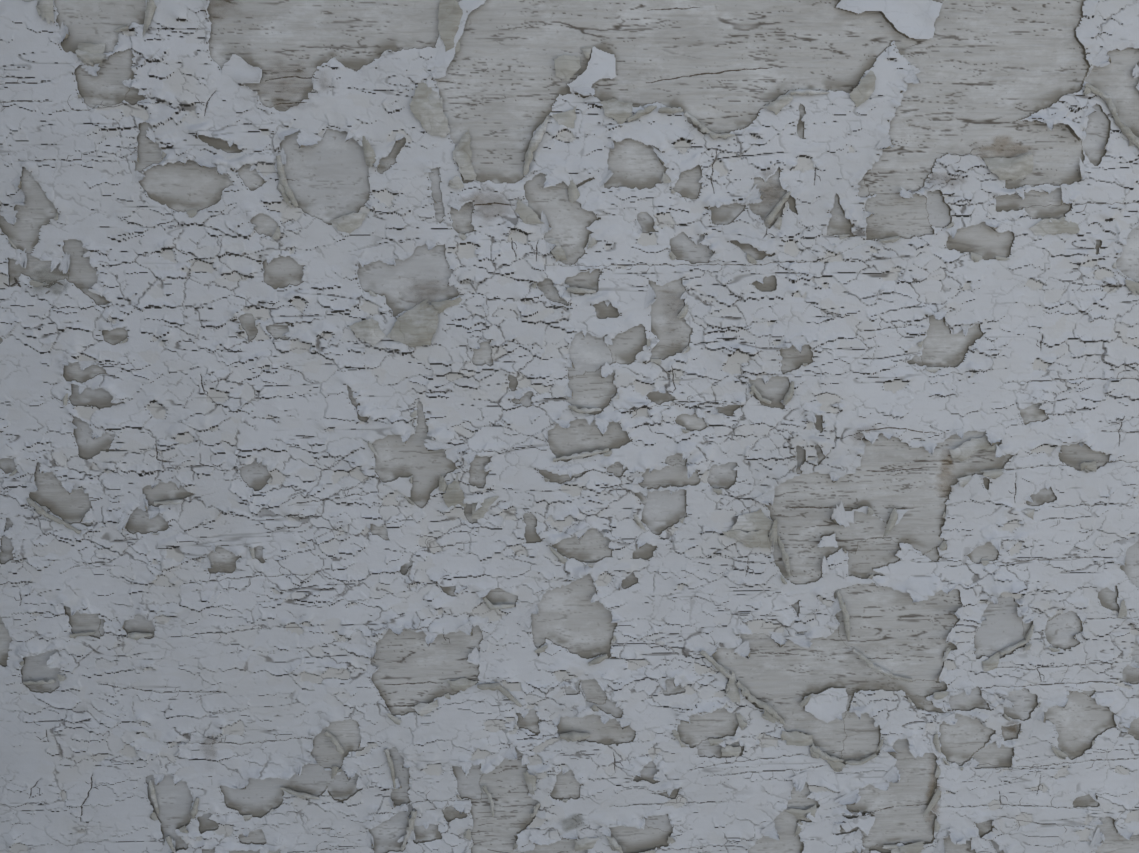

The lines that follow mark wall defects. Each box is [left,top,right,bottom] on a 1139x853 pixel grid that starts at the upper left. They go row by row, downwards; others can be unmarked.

crack [646,67,773,83]
peeling [203,0,1139,348]
crack [511,230,856,271]
peeling [534,277,739,591]
crack [857,426,935,434]
crack [1007,416,1138,501]
peeling [365,508,636,746]
peeling [672,411,1139,853]
crack [955,657,1139,690]
peeling [146,717,368,853]
peeling [365,743,682,853]
crack [862,758,1137,832]